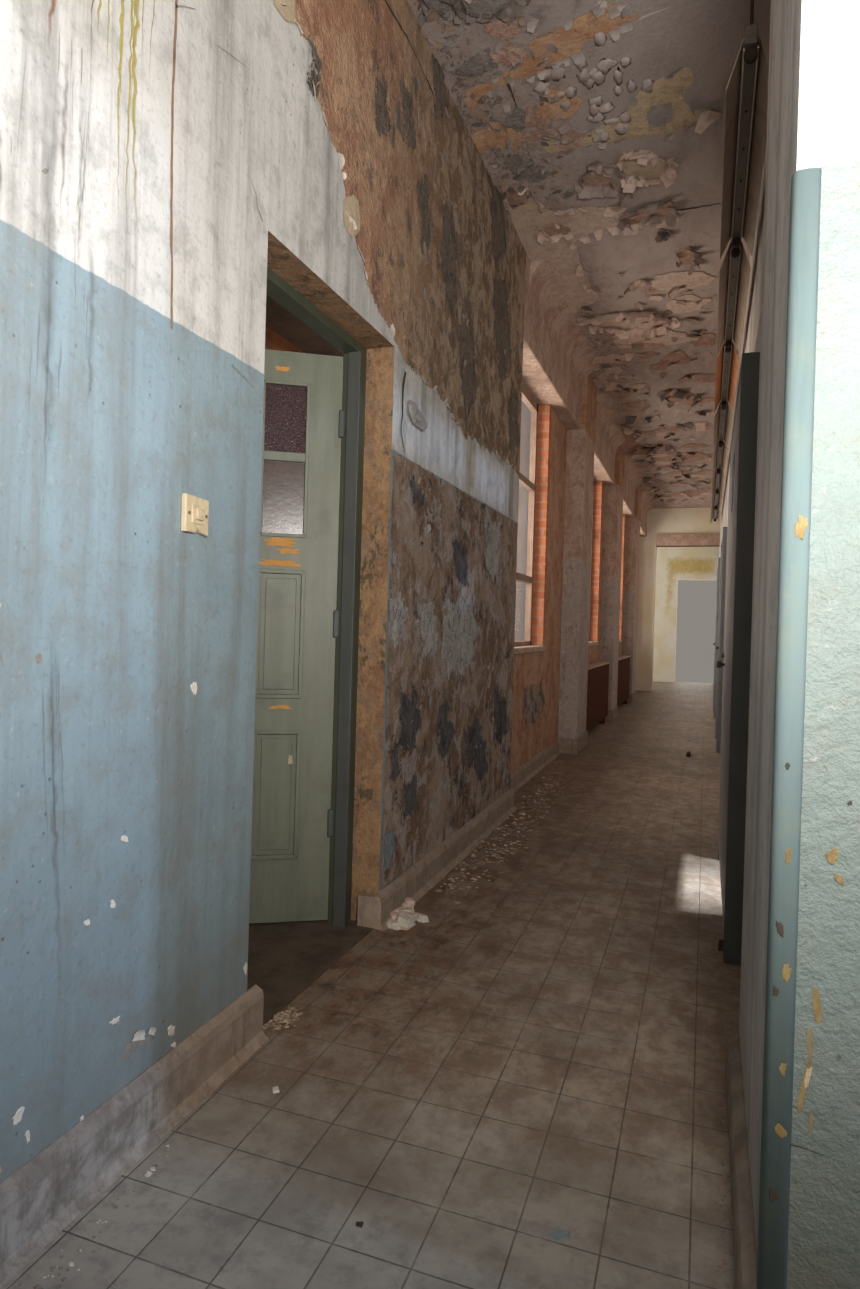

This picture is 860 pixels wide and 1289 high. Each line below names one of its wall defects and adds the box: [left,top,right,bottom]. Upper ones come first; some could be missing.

leakage [98,0,155,155]
flaking render [274,0,721,503]
spalling [795,515,808,540]
peeling [381,452,546,889]
spalling [825,848,841,884]
spalling [773,963,792,996]
flaking render [122,1025,176,1061]
spalling [12,1107,30,1143]
spalling [775,1124,787,1139]